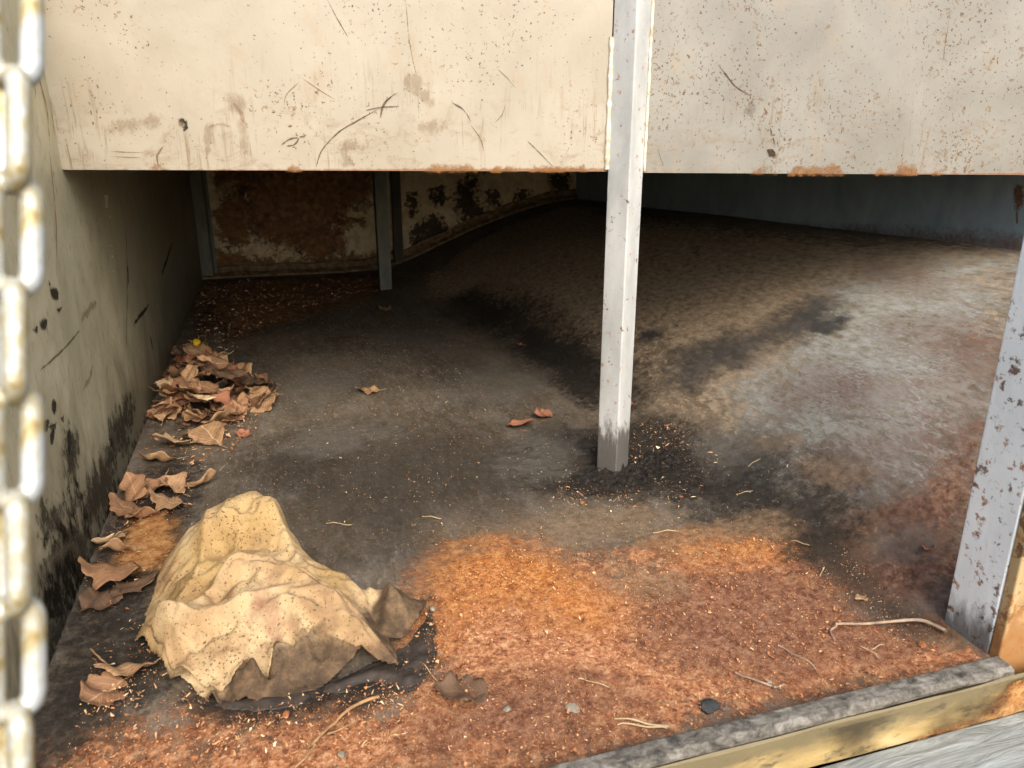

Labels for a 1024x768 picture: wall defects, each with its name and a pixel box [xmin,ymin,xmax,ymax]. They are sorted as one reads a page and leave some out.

corrosion [428,165,475,173]
corrosion [788,164,841,176]
corrosion [877,166,917,176]
leakage [36,393,147,671]